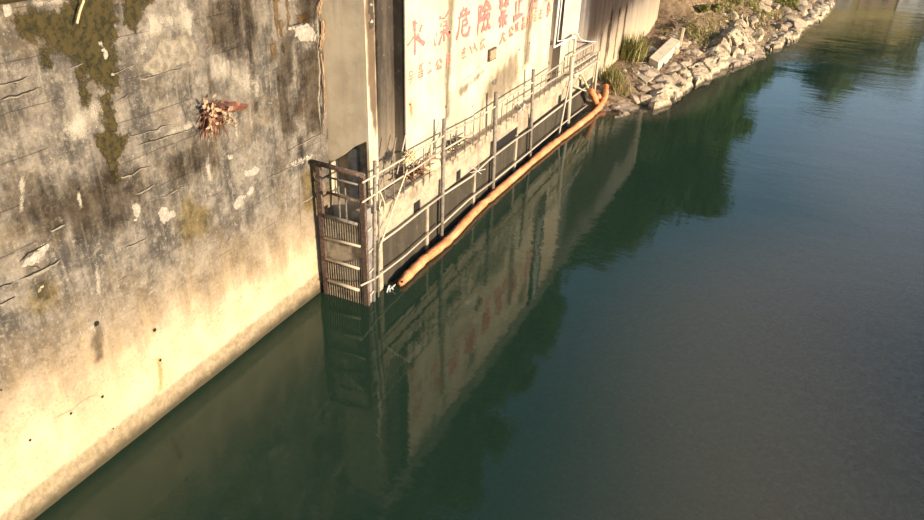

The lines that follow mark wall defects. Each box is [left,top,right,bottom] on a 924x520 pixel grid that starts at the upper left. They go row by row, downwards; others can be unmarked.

damp [39,46,54,69]
rust [270,0,310,60]
spalling [288,22,318,42]
damp [589,0,628,64]
damp [64,65,118,141]
spalling [20,243,50,267]